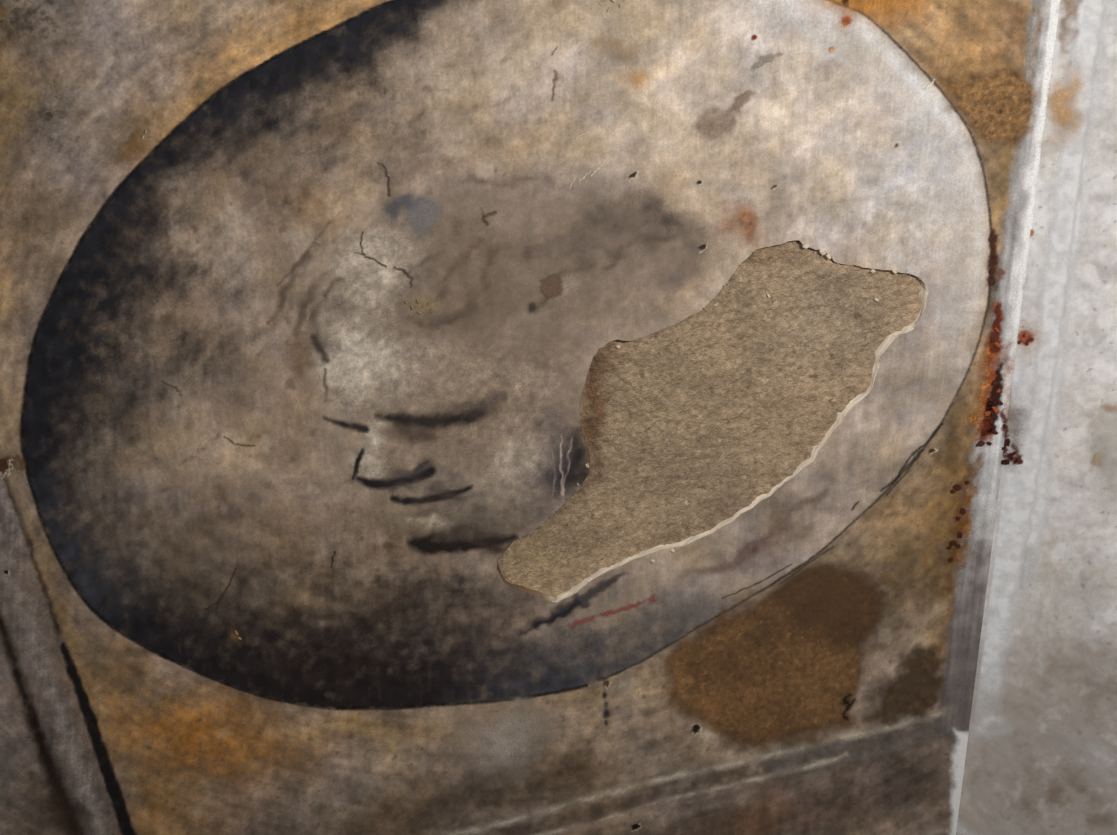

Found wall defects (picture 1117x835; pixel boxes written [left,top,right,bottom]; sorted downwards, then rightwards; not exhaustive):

spalling [497,240,929,603]
rust [947,230,1034,567]